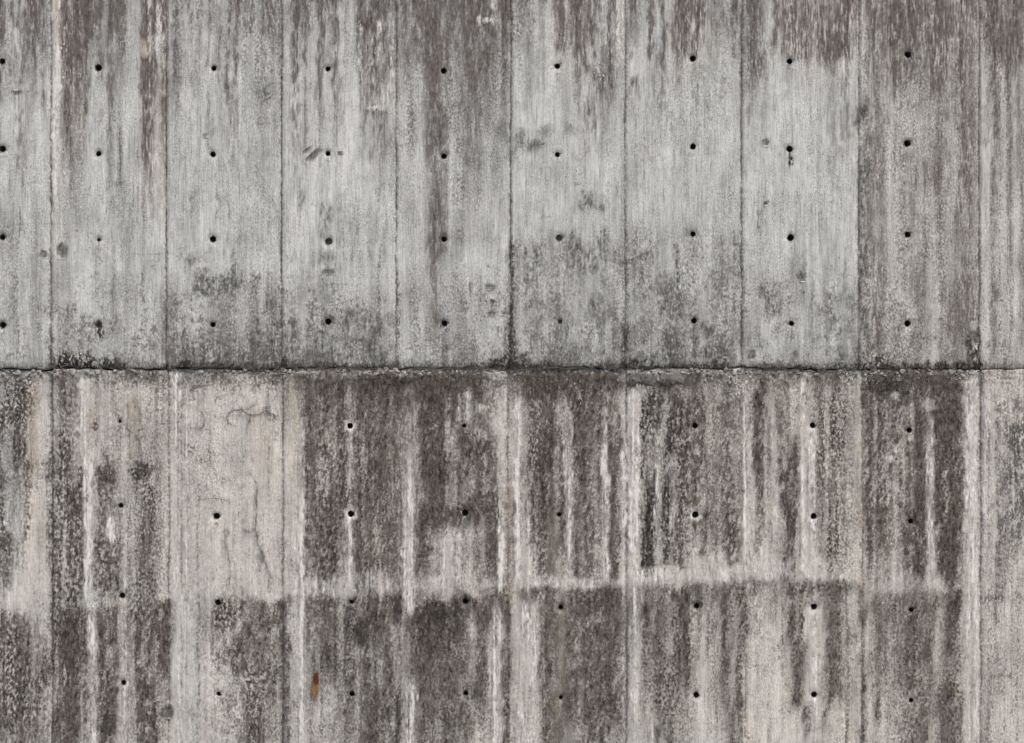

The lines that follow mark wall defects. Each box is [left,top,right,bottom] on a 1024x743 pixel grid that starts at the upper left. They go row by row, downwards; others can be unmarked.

damp [0,0,126,153]
damp [139,0,176,176]
damp [207,0,340,134]
damp [355,0,510,159]
damp [498,122,547,153]
damp [553,0,616,126]
damp [630,0,1023,234]
damp [428,166,447,330]
crack [192,380,278,429]
damp [0,230,1024,743]